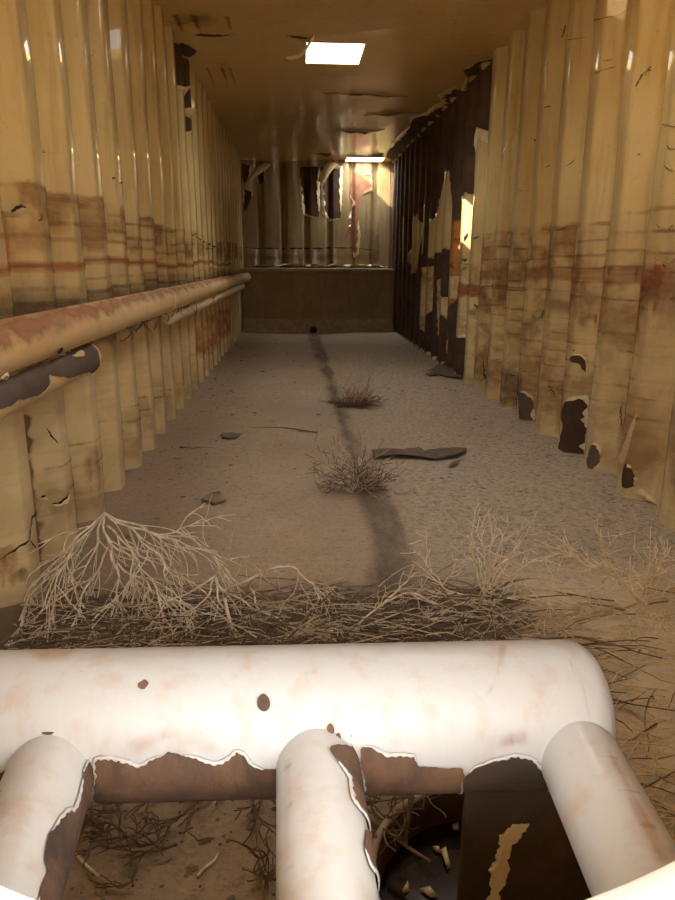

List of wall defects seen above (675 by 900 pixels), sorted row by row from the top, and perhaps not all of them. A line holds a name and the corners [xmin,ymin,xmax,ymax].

peeling [299,153,373,258]
peeling [369,60,493,377]
corrosion [8,262,85,271]
corrosion [108,257,231,268]
peeling [0,343,100,410]
peeling [517,391,536,420]
peeling [569,350,588,375]
peeling [558,395,601,469]
peeling [621,464,637,488]
crack [0,492,70,560]
peeling [37,749,276,900]
peeling [327,723,549,900]